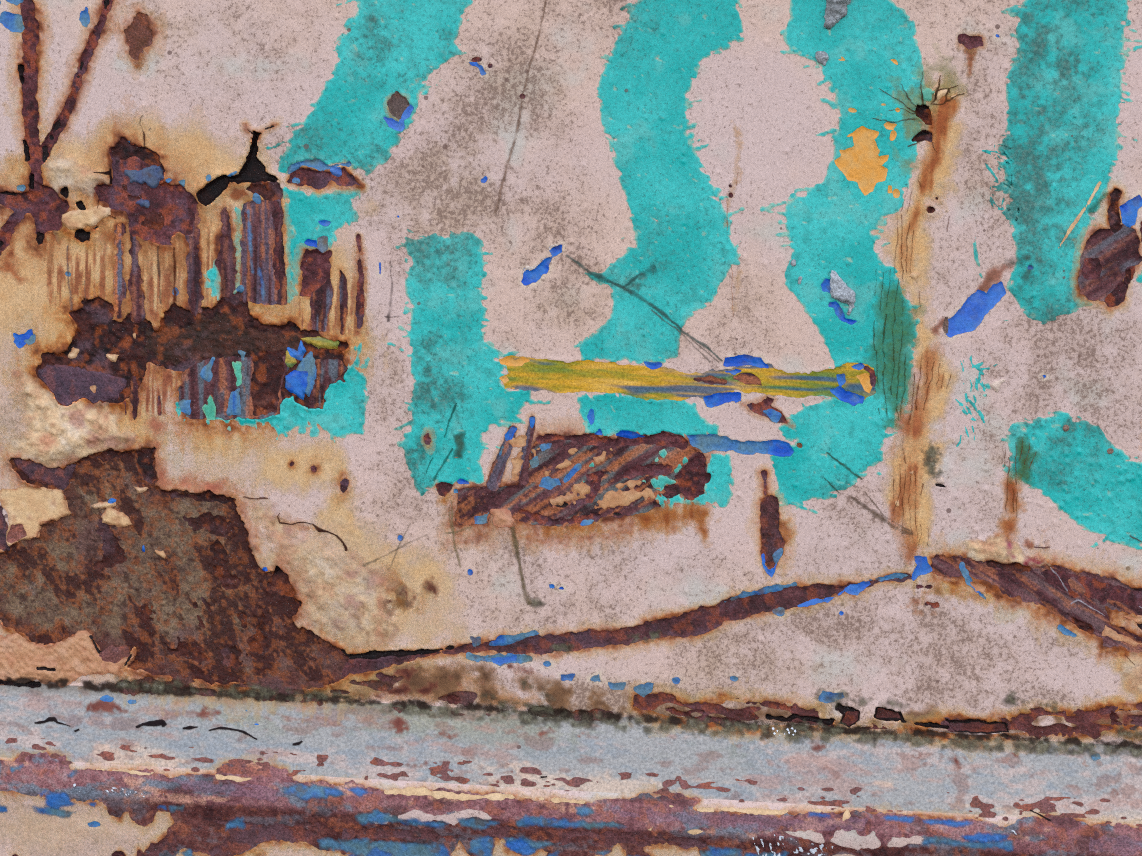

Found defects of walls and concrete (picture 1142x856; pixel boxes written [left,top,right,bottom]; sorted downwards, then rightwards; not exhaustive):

peeling [196,122,366,206]
peeling [13,329,36,348]
peeling [62,205,111,246]
corrosion [0,0,627,733]
peeling [299,220,333,331]
corrosion [873,78,963,561]
corrosion [1075,186,1142,312]
spalling [336,469,1142,684]
corrosion [912,584,956,608]
peeling [100,695,137,704]
corrosion [627,658,1142,761]
corrosion [0,738,1142,856]